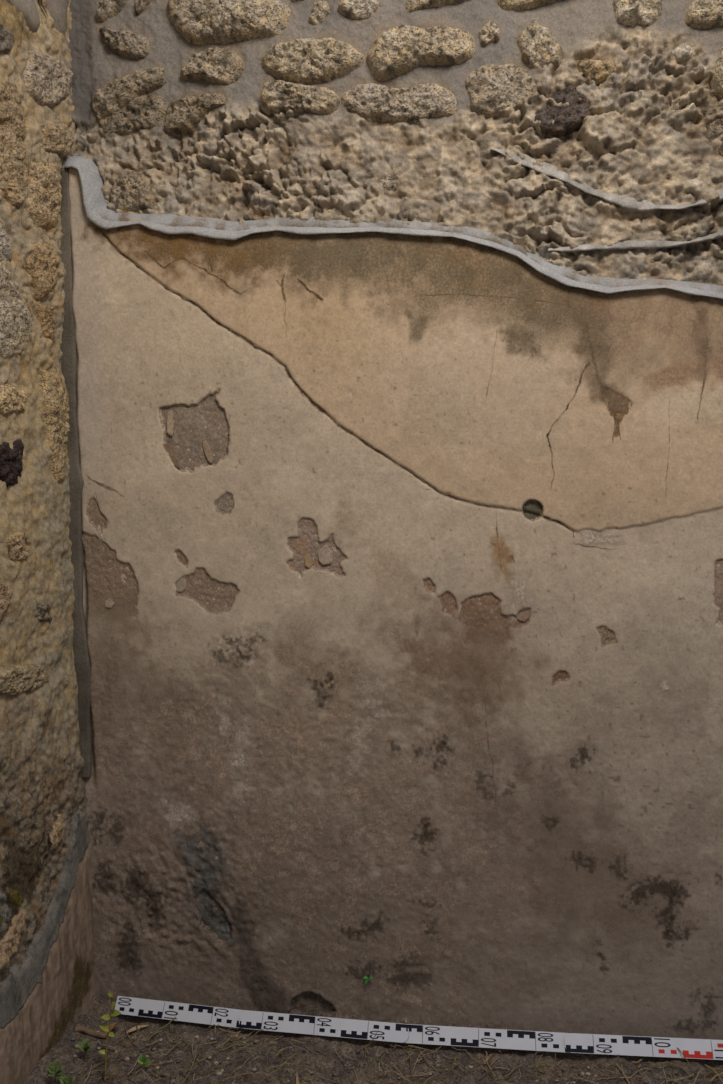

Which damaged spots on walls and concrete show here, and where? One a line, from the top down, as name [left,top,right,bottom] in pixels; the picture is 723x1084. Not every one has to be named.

leakage [84,210,723,411]
flaking render [160,392,229,472]
crack [99,229,513,559]
crack [546,345,604,466]
flaking render [82,498,139,612]
flaking render [175,550,239,612]
flaking render [287,518,347,577]
flaking render [424,578,530,640]
flaking render [715,559,723,625]
leakage [85,618,694,1027]